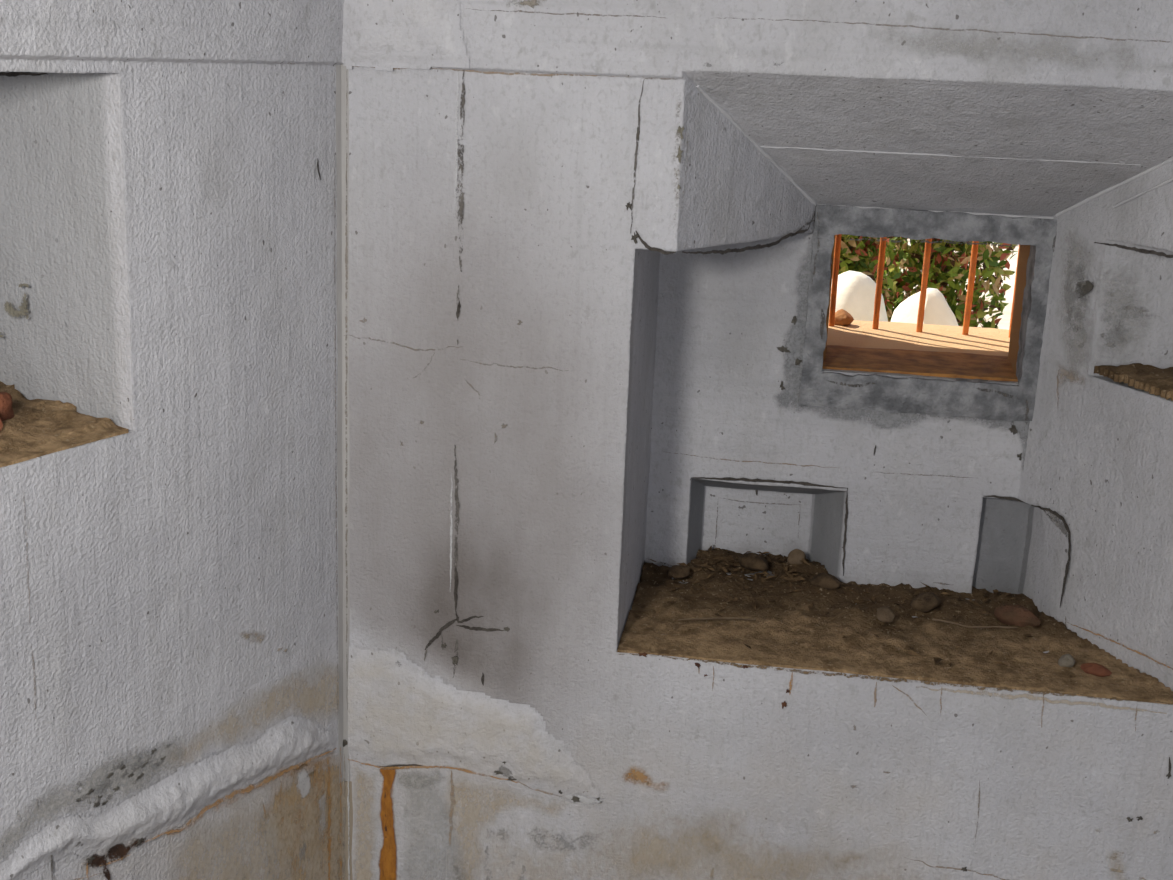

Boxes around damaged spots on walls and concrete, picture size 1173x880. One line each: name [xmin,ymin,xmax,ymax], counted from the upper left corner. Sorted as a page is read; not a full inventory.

crack [625,78,1057,282]
crack [818,309,826,339]
crack [317,66,612,730]
leakage [181,747,558,880]
corrosion [379,767,409,880]